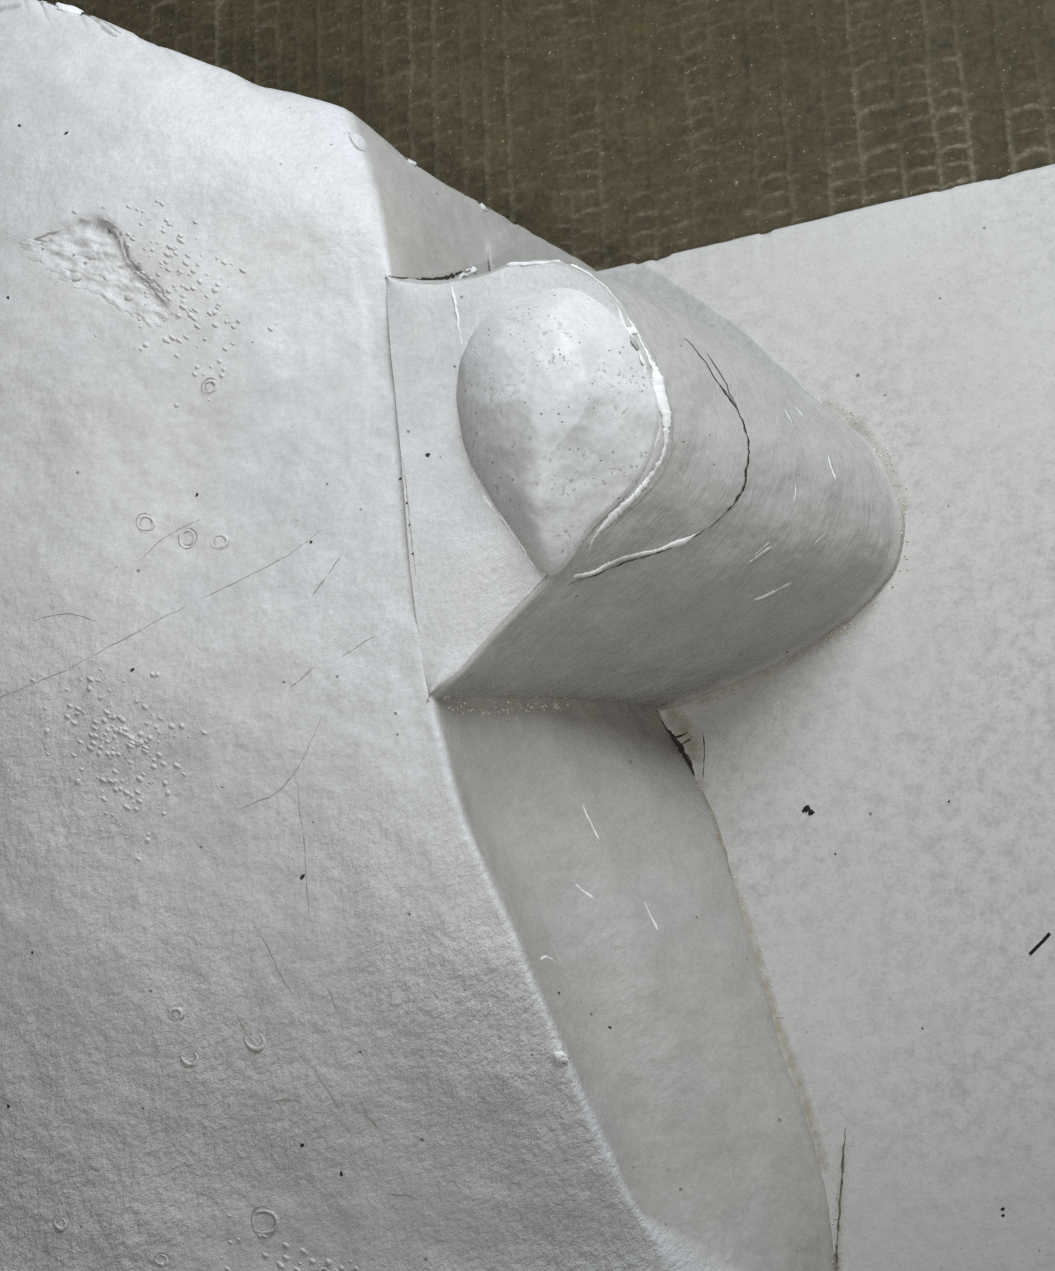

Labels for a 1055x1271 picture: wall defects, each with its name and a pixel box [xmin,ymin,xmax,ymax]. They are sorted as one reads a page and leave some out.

peeling [388,267,478,280]
peeling [505,260,674,555]